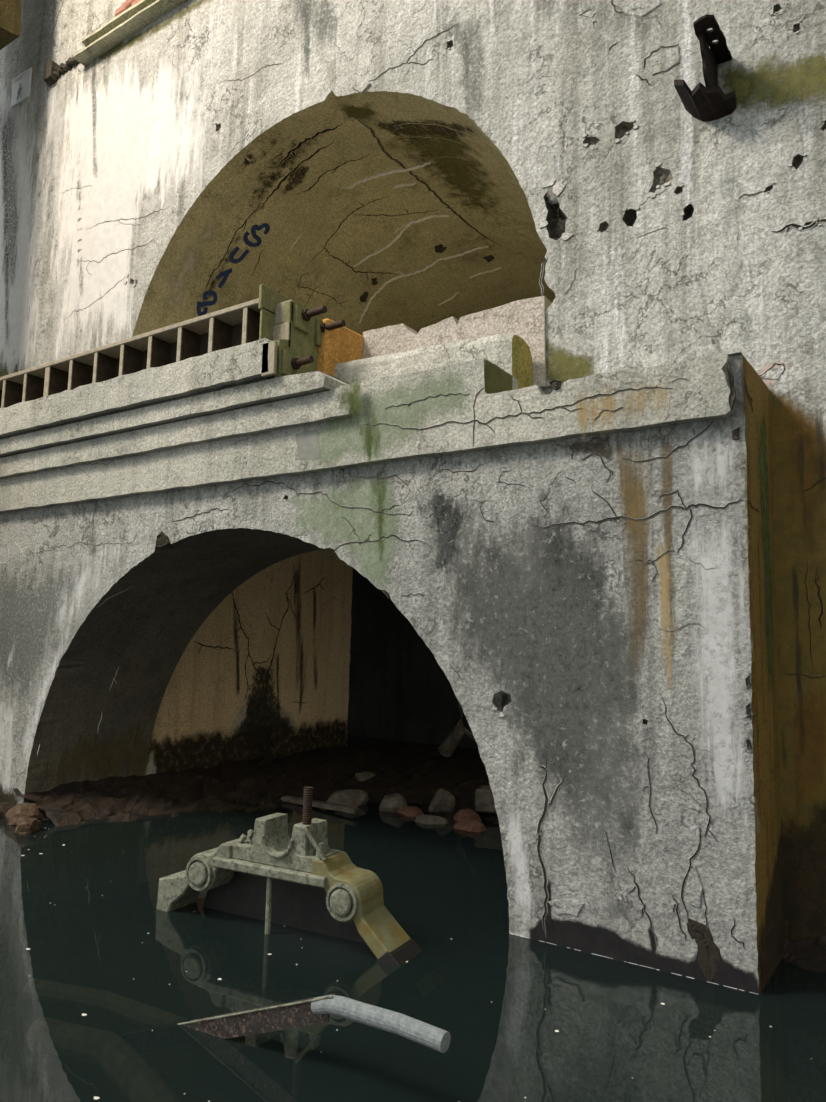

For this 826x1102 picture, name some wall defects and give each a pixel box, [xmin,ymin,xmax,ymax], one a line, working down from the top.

water stain [0,58,212,377]
crack [195,109,503,324]
spalling [539,179,574,241]
spalling [615,120,639,144]
spalling [622,206,640,226]
spalling [649,161,684,199]
crack [365,378,759,580]
water stain [0,547,120,806]
water stain [434,447,671,848]
water stain [508,363,826,995]
crack [536,759,564,939]
crack [603,693,747,983]